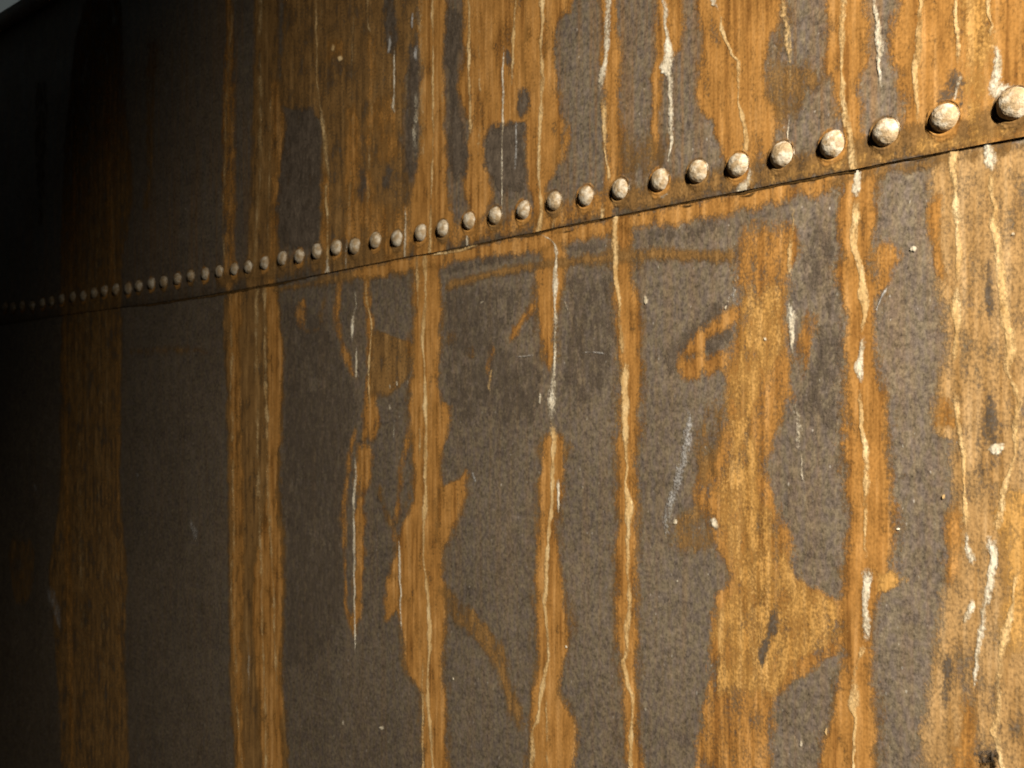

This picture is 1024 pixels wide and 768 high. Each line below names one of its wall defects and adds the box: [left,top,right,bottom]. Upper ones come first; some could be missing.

water stain [659,0,673,157]
water stain [949,151,963,275]
rust [215,0,1024,768]
water stain [952,289,962,358]
water stain [973,541,997,680]